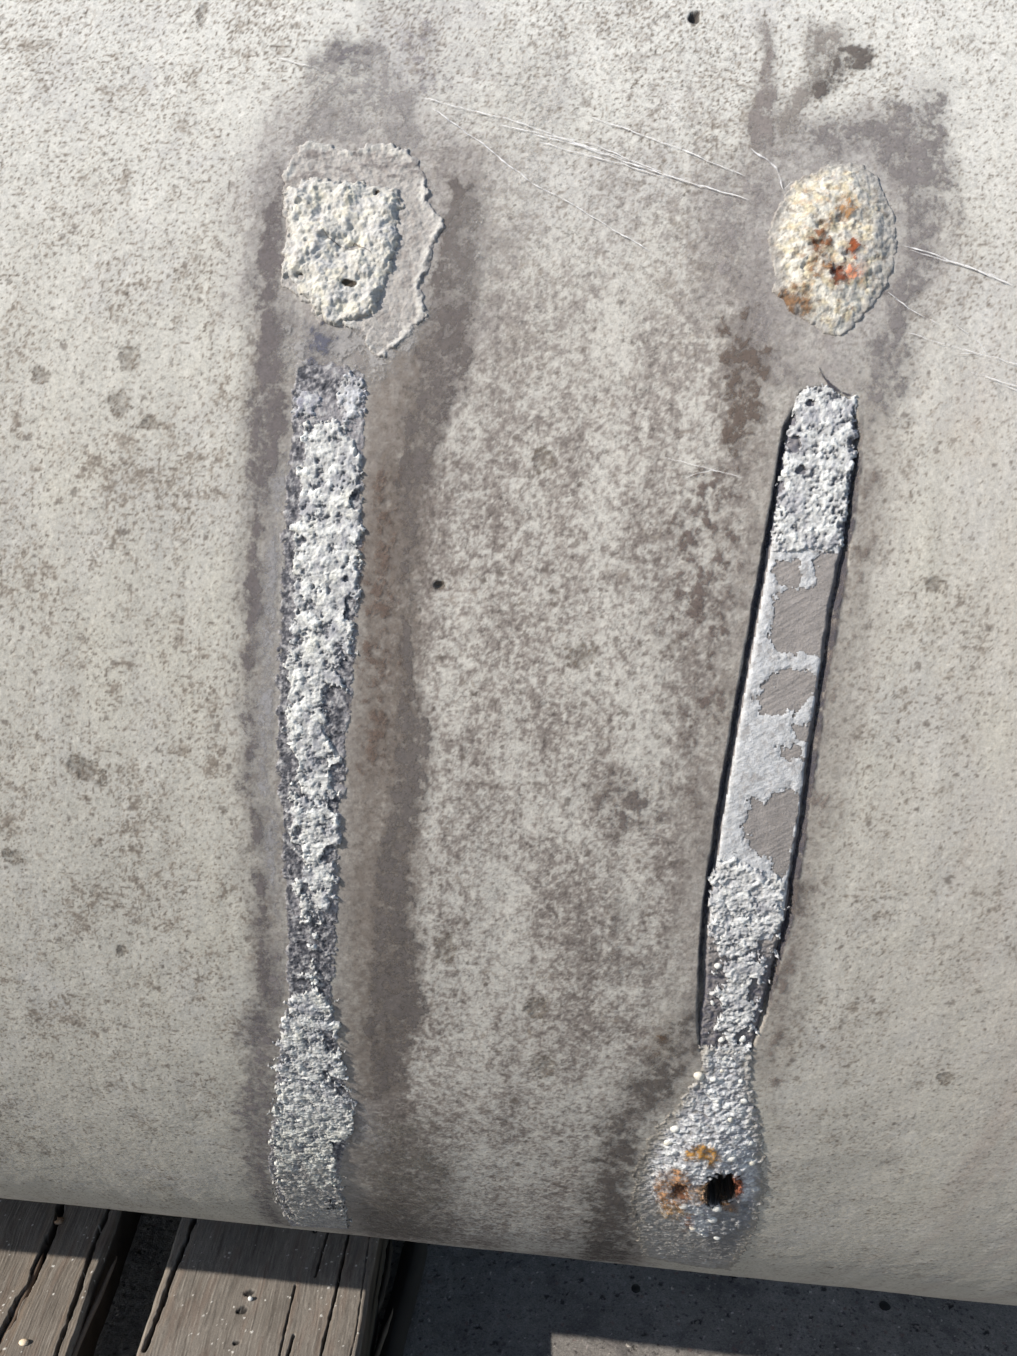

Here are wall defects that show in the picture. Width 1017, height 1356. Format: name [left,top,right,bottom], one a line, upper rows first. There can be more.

water stain [235,700,264,844]
water stain [240,169,289,680]
water stain [356,178,484,1100]
water stain [665,304,798,748]
corrosion [778,194,865,319]
water stain [705,23,965,421]
water stain [232,869,290,1226]
water stain [577,1013,700,1263]
corrosion [654,1145,722,1225]
corrosion [723,1176,744,1212]